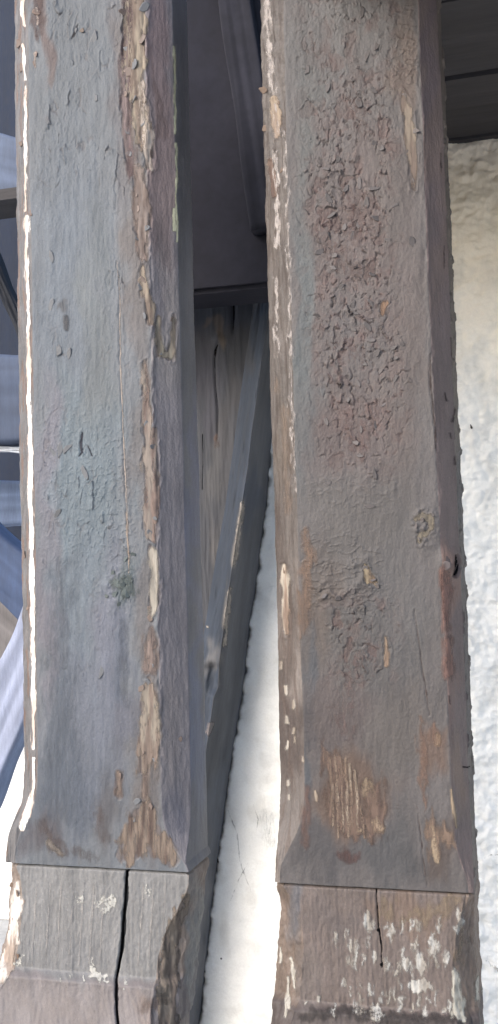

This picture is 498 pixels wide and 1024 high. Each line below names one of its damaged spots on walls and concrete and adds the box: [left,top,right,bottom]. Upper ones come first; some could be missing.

peeling [20,0,40,27]
peeling [118,0,176,359]
peeling [401,89,420,189]
peeling [16,39,38,831]
peeling [114,363,177,868]
peeling [314,749,387,845]
peeling [424,789,457,863]
peeling [0,881,117,984]
crack [115,869,129,1024]
peeling [279,947,296,1018]
crack [375,889,383,967]
peeling [334,908,482,1022]